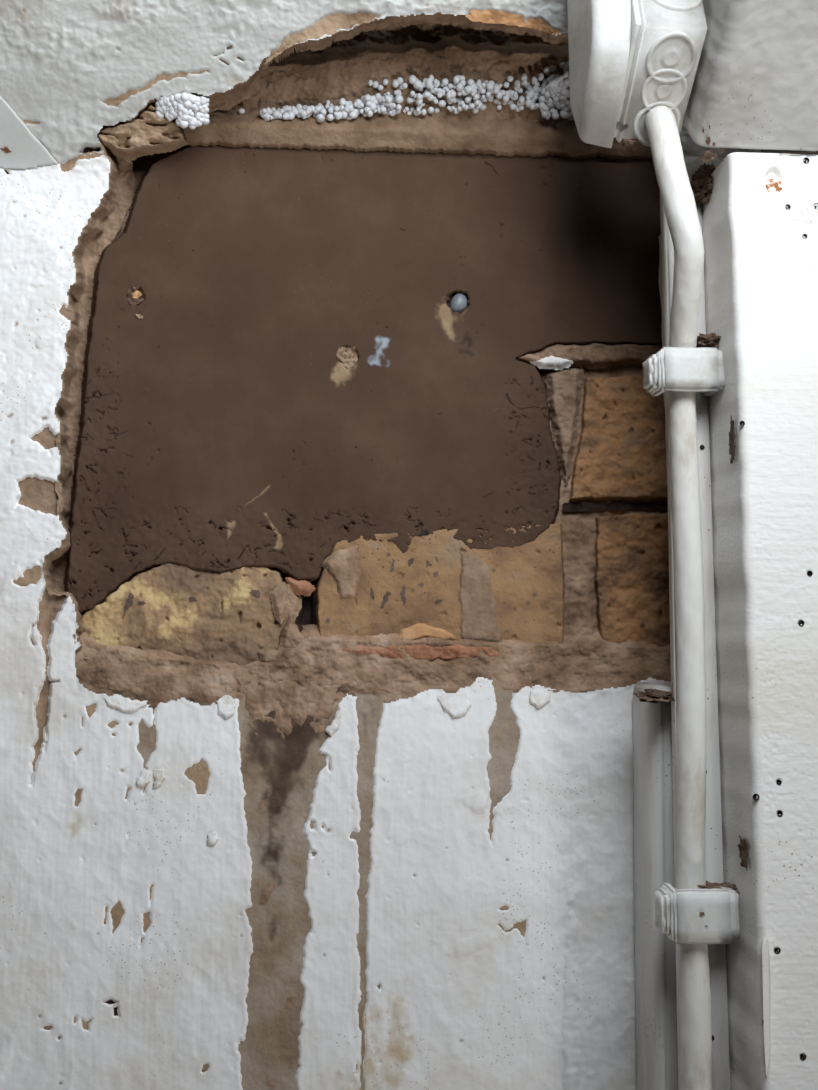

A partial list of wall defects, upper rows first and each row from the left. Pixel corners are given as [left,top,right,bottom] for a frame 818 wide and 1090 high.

spalling [190,10,568,113]
peeling [103,70,209,119]
flaking render [13,142,670,665]
peeling [81,694,165,799]
peeling [184,758,210,794]
damp [248,711,319,814]
damp [263,845,280,873]
peeling [104,900,125,933]
peeling [140,885,153,945]